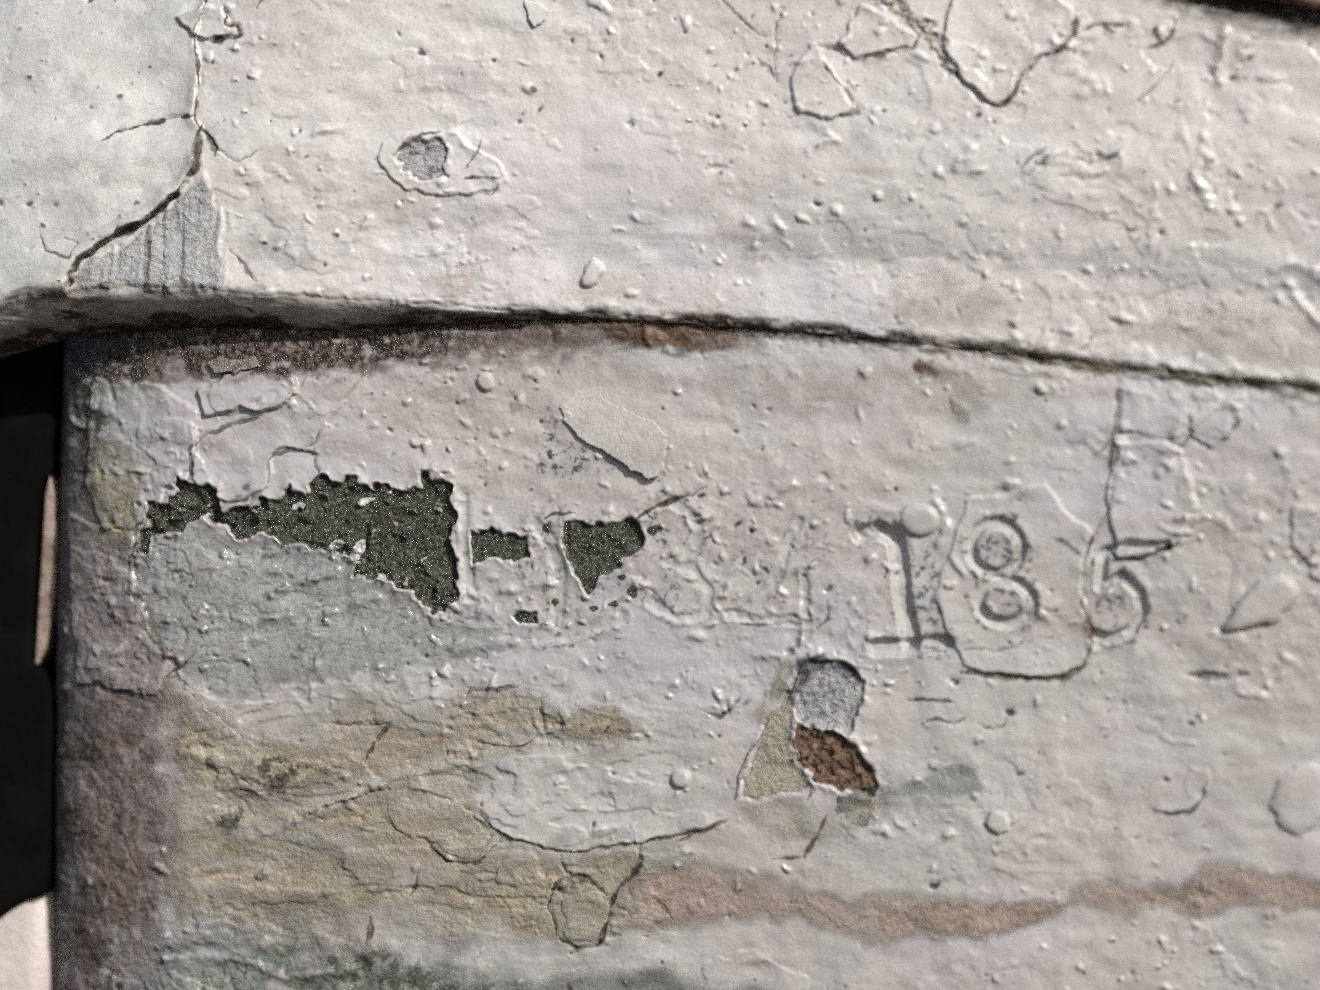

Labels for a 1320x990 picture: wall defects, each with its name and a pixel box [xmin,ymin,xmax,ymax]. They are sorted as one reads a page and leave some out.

crack [41,0,262,287]
peeling [394,131,447,180]
peeling [465,140,499,193]
peeling [76,179,221,290]
peeling [560,386,667,479]
water stain [0,310,571,990]
peeling [136,471,530,700]
peeling [513,612,537,623]
peeling [542,518,663,611]
crack [390,308,1320,730]
peeling [737,653,884,836]